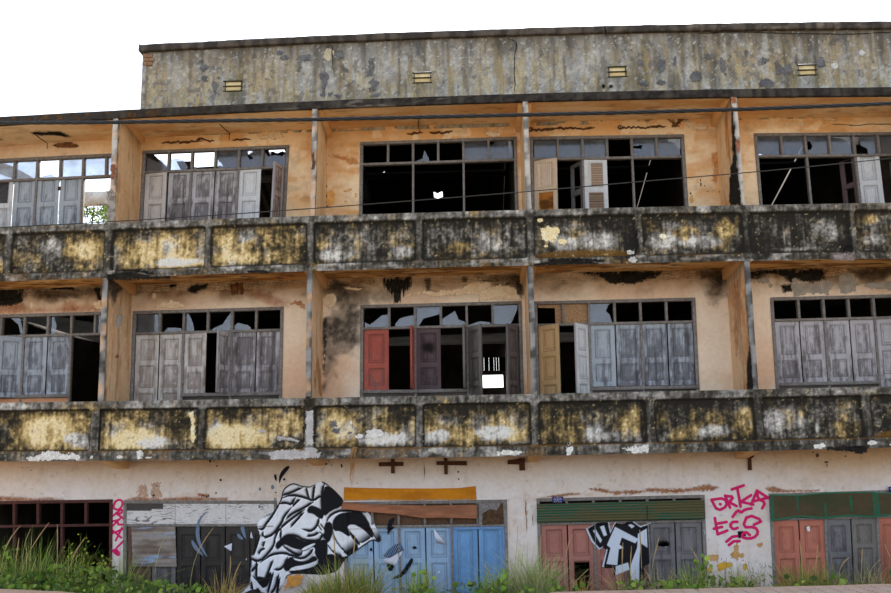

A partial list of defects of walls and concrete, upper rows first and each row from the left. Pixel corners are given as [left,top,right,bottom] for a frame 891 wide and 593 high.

peeling [639,56,676,86]
peeling [759,54,799,88]
peeling [22,450,93,471]